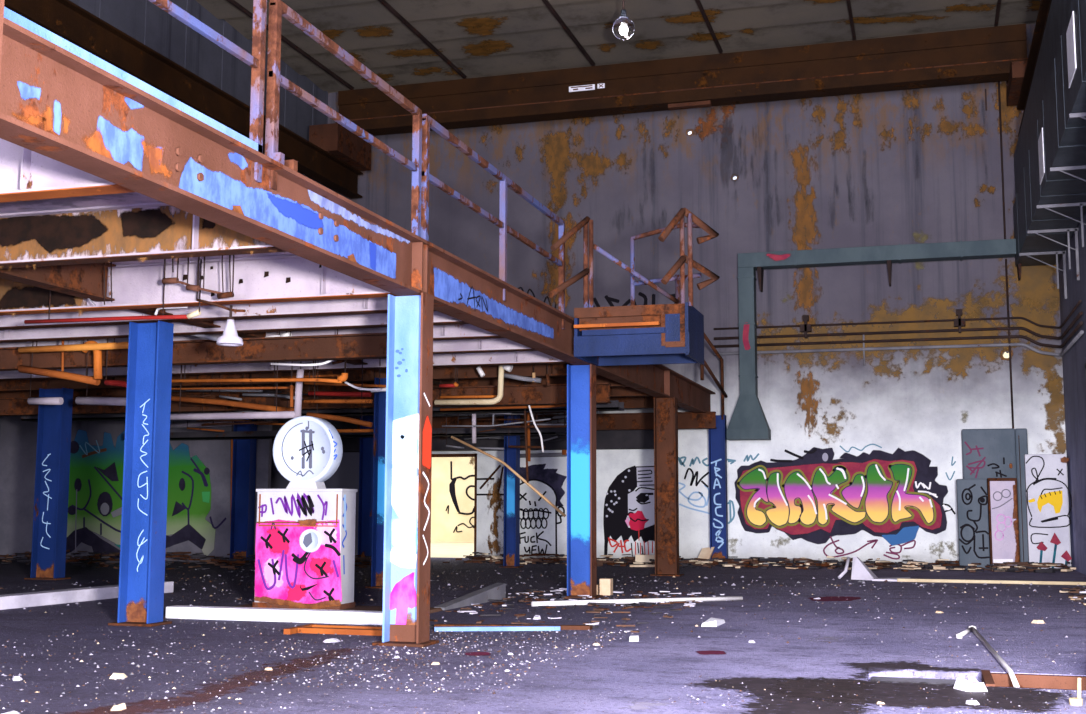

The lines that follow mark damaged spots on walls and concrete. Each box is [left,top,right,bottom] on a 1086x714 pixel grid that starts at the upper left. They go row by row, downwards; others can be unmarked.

peeling [539,117,632,214]
corrosion [787,144,821,250]
corrosion [532,197,582,308]
corrosion [757,258,1066,454]
corrosion [126,599,147,622]
leakage [690,661,1067,714]